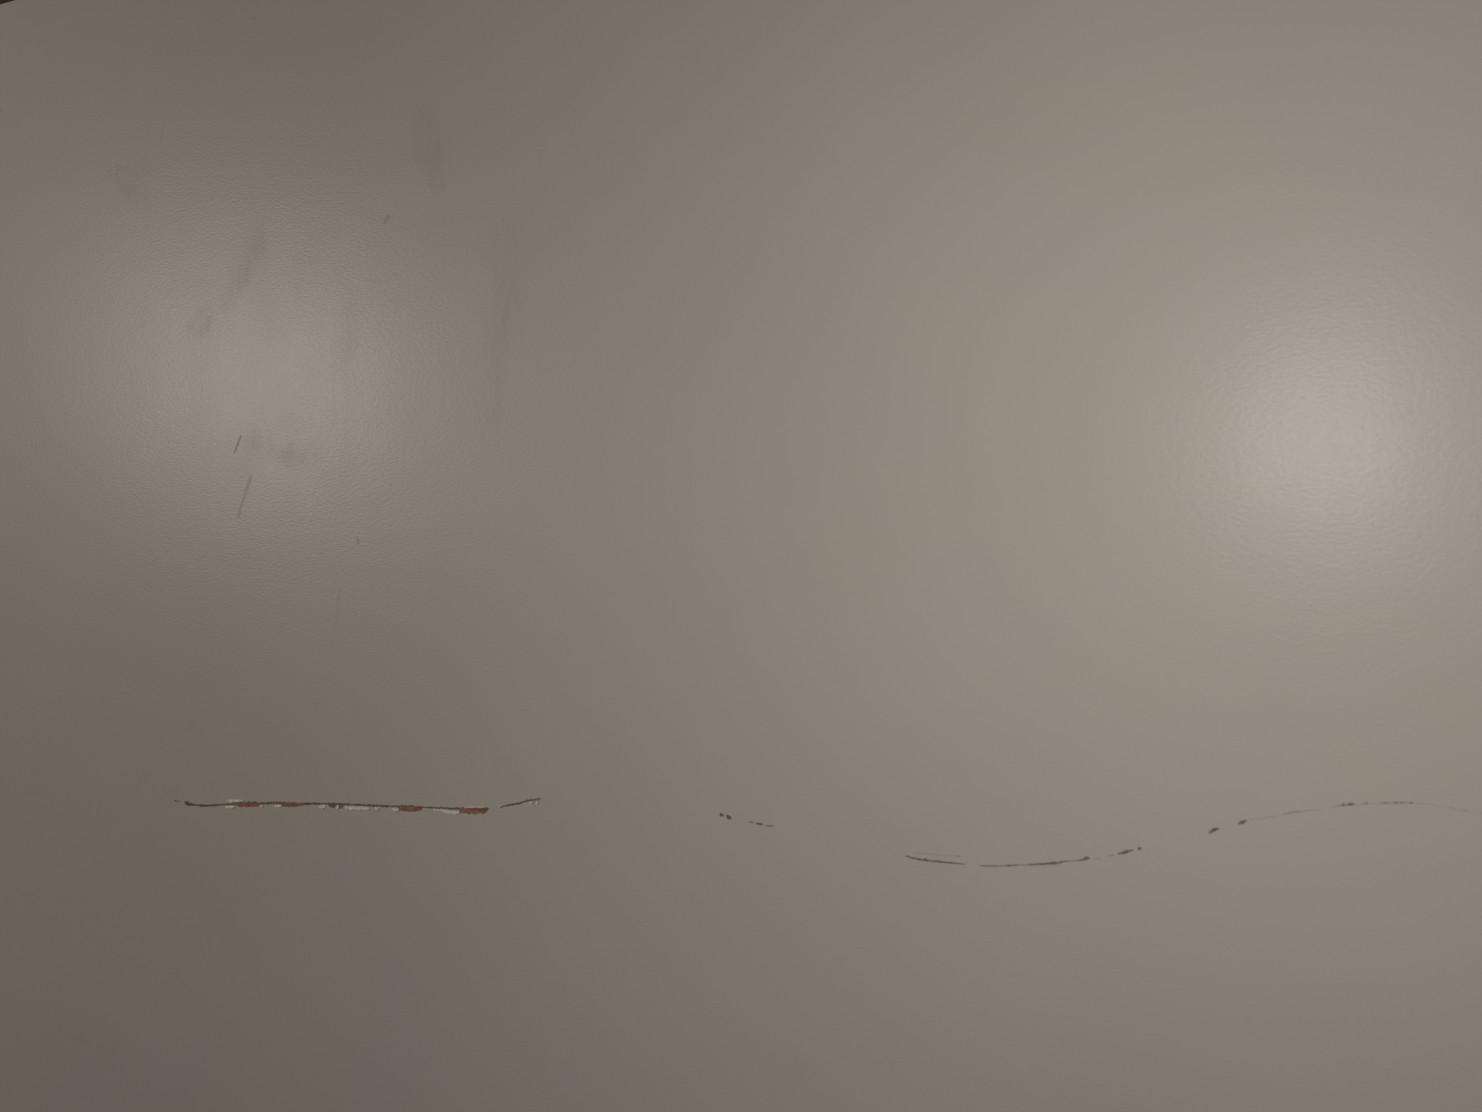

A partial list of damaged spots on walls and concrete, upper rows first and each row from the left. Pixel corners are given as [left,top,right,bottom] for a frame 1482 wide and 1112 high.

crack [174,798,541,815]
crack [1209,802,1481,834]
crack [905,847,1141,867]